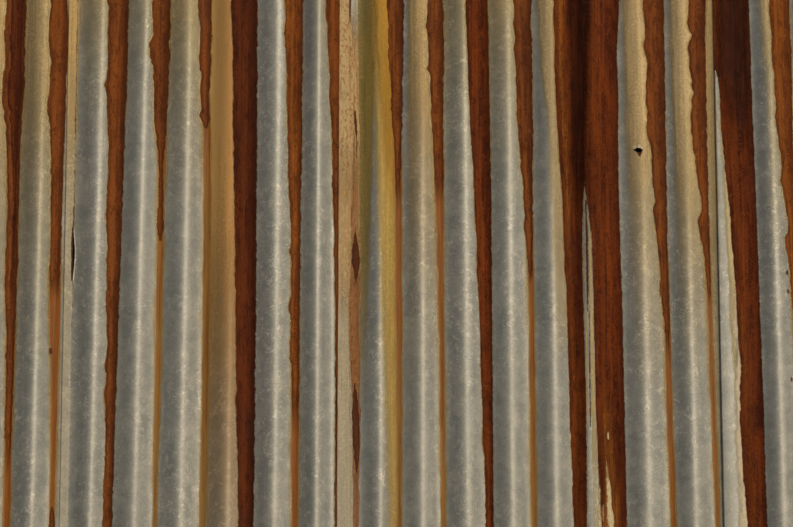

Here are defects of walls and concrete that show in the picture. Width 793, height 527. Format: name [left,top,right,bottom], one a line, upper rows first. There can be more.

rust [0,0,27,527]
rust [46,0,69,527]
rust [102,0,129,527]
rust [148,0,172,527]
rust [197,0,258,527]
rust [284,0,304,527]
rust [387,0,404,527]
rust [464,0,494,527]
rust [553,0,627,527]
rust [641,0,677,527]
rust [686,0,768,527]
rust [768,0,793,307]